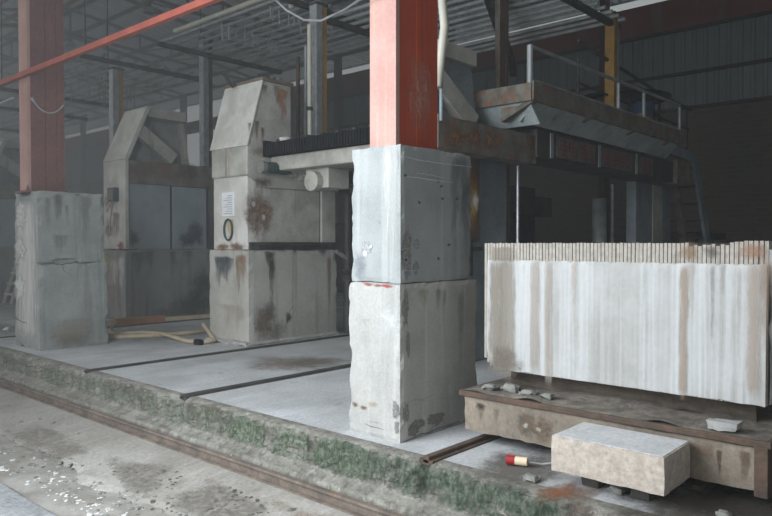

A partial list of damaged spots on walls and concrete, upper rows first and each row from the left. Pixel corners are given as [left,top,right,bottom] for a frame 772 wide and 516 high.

corrosion [246,179,272,234]
leakage [215,256,233,276]
corrosion [218,243,245,285]
leakage [265,252,274,281]
spalling [393,401,444,436]